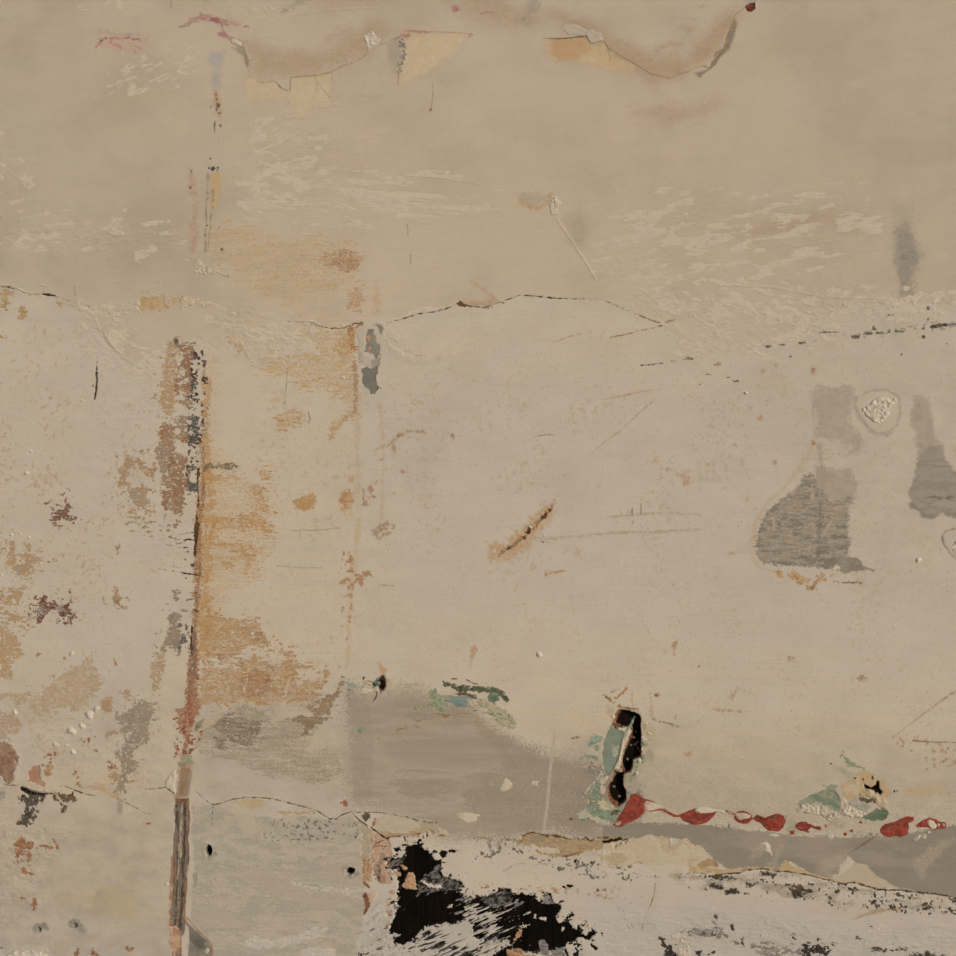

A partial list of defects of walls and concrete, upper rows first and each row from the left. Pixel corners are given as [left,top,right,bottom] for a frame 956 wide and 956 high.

crack [0,284,89,307]
crack [396,282,675,338]
leakage [749,367,875,574]
leakage [908,394,956,521]
corrosion [172,348,239,798]
corrosion [483,499,564,577]
peeling [0,335,365,956]
crack [6,784,95,797]
crack [118,787,427,870]
flaking render [342,811,603,956]
peeling [658,914,834,956]
peeling [870,947,945,956]